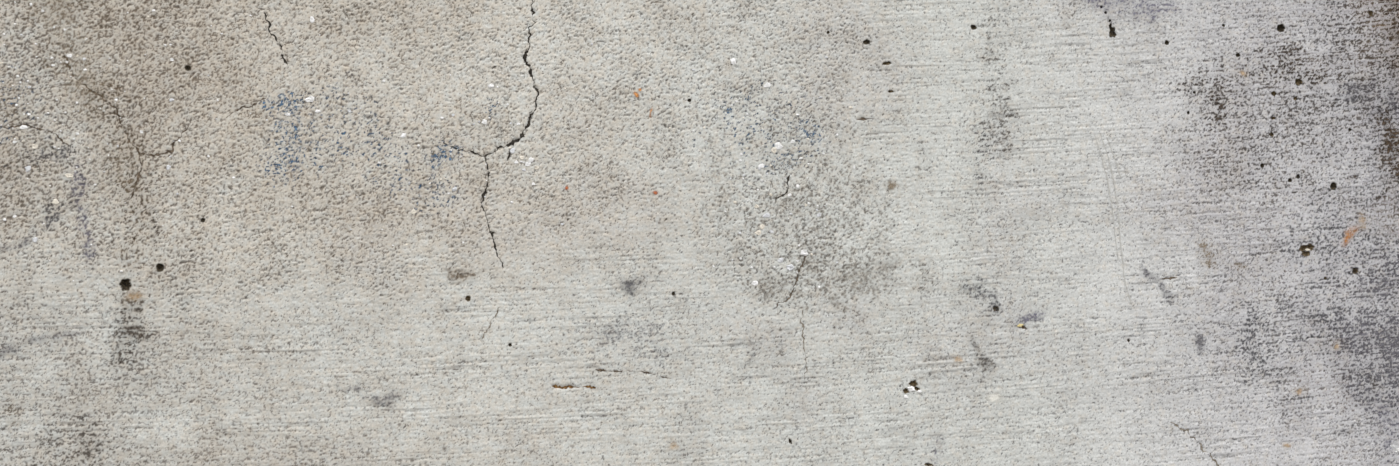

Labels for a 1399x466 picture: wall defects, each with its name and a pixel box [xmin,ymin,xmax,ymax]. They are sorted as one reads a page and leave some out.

crack [443,0,539,268]